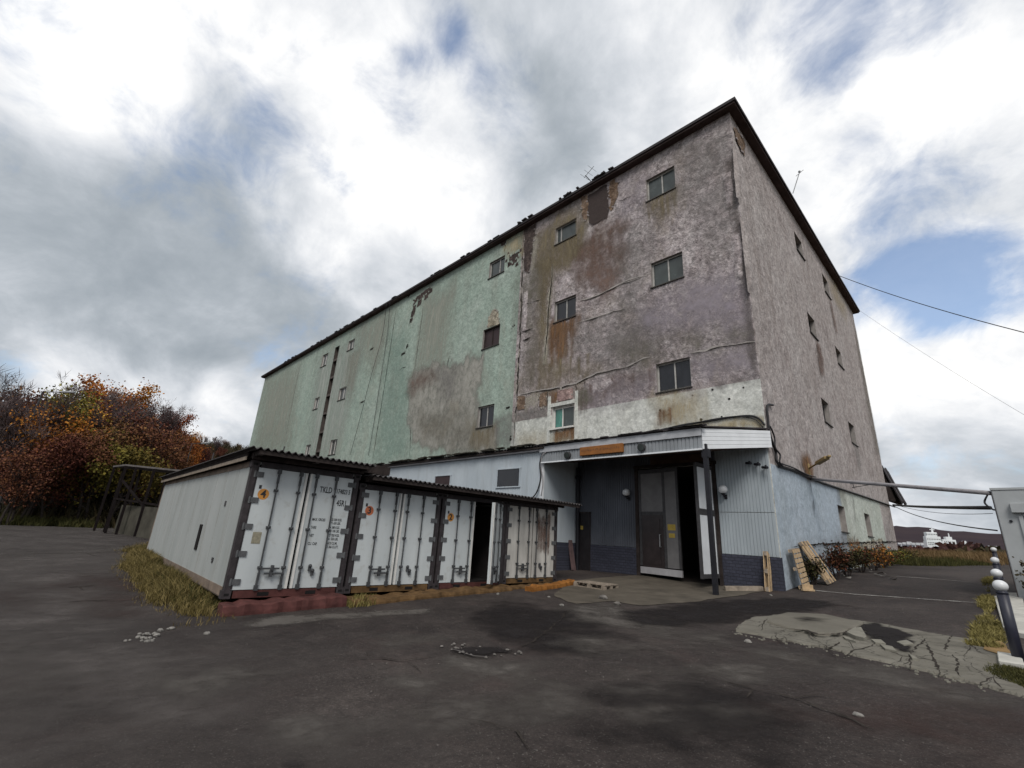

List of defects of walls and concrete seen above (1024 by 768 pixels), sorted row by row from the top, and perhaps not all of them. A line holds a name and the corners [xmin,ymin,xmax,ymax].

spalling [580,179,619,225]
spalling [500,223,536,273]
peeling [408,286,432,324]
rust [549,319,589,378]
crack [504,237,651,440]
peeling [505,396,525,410]
crack [760,620,1007,688]